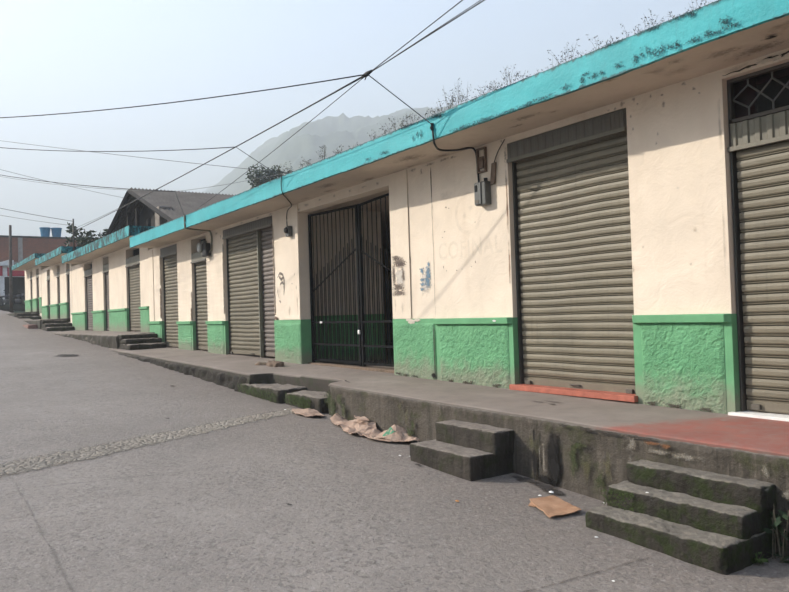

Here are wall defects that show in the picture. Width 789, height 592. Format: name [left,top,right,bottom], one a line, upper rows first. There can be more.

mould [633,17,740,67]
water stain [513,430,564,495]